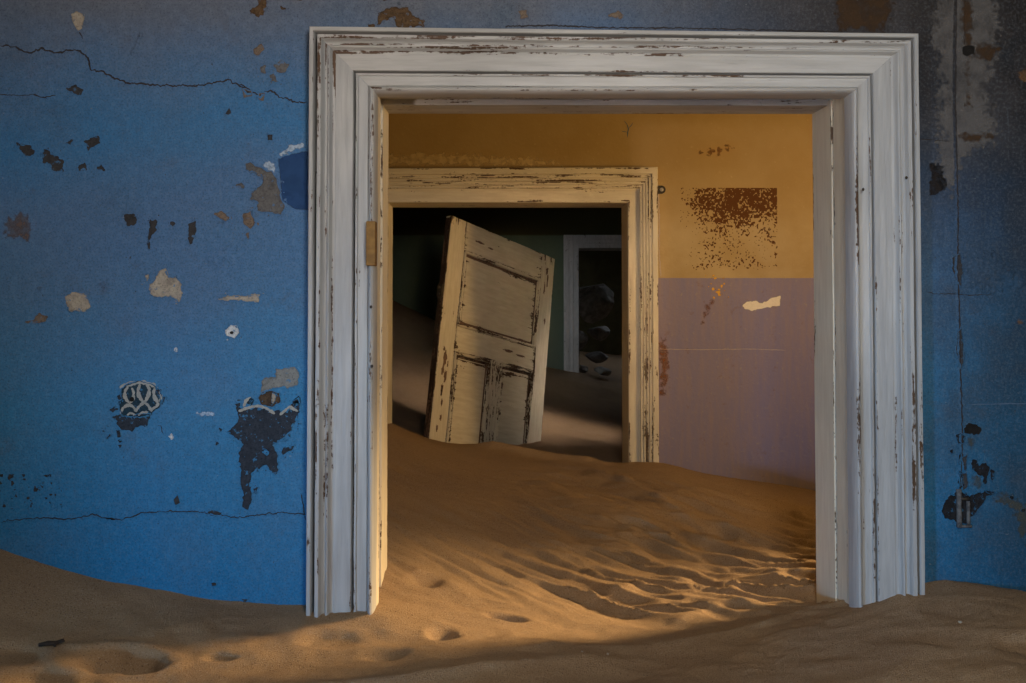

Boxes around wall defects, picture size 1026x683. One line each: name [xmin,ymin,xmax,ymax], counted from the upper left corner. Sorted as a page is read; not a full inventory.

peeling [244,0,309,22]
peeling [364,2,429,28]
crack [0,32,307,106]
peeling [121,157,287,307]
peeling [61,287,96,317]
peeling [101,379,167,448]
peeling [206,366,304,517]
crack [1,494,306,526]
spalling [937,423,1025,530]